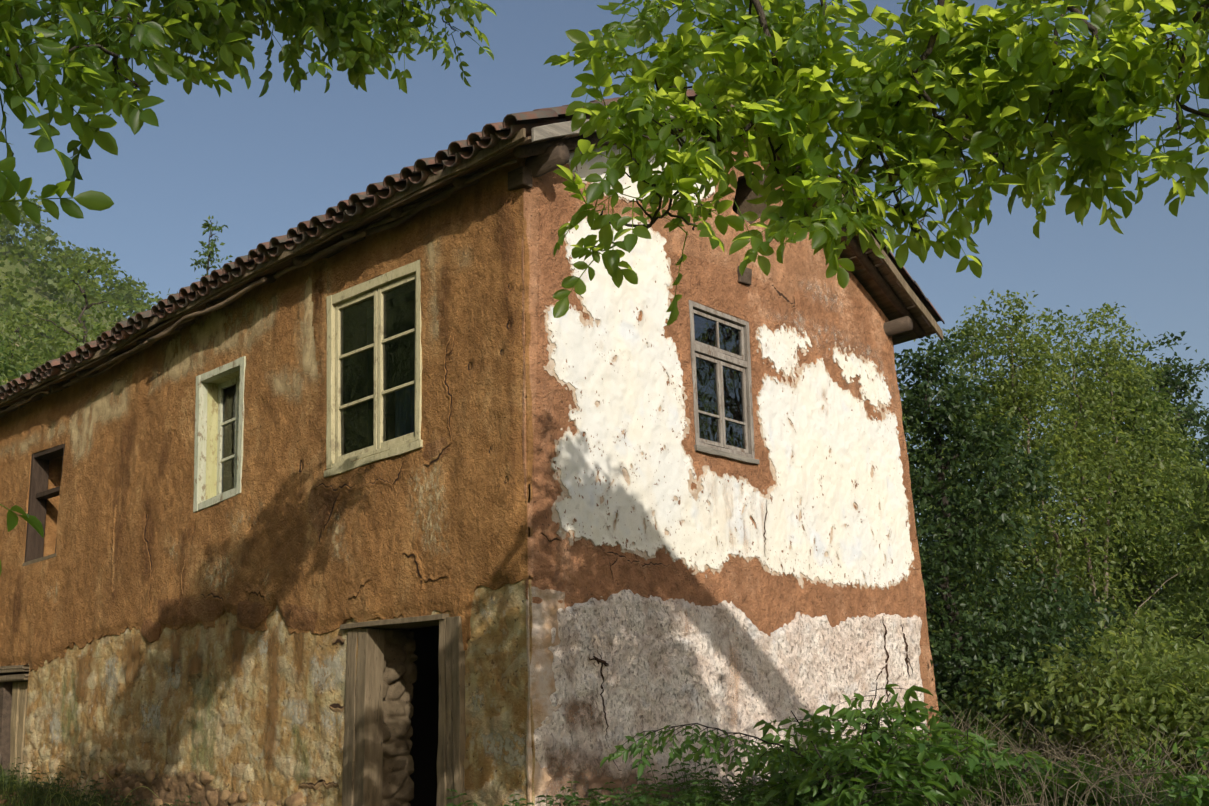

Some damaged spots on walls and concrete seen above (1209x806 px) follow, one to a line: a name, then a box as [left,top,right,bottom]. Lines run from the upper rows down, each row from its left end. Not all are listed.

crack [312,332,455,543]
spalling [532,191,927,645]
crack [402,549,449,589]
crack [589,650,622,778]
crack [873,616,914,702]
spalling [91,763,320,806]